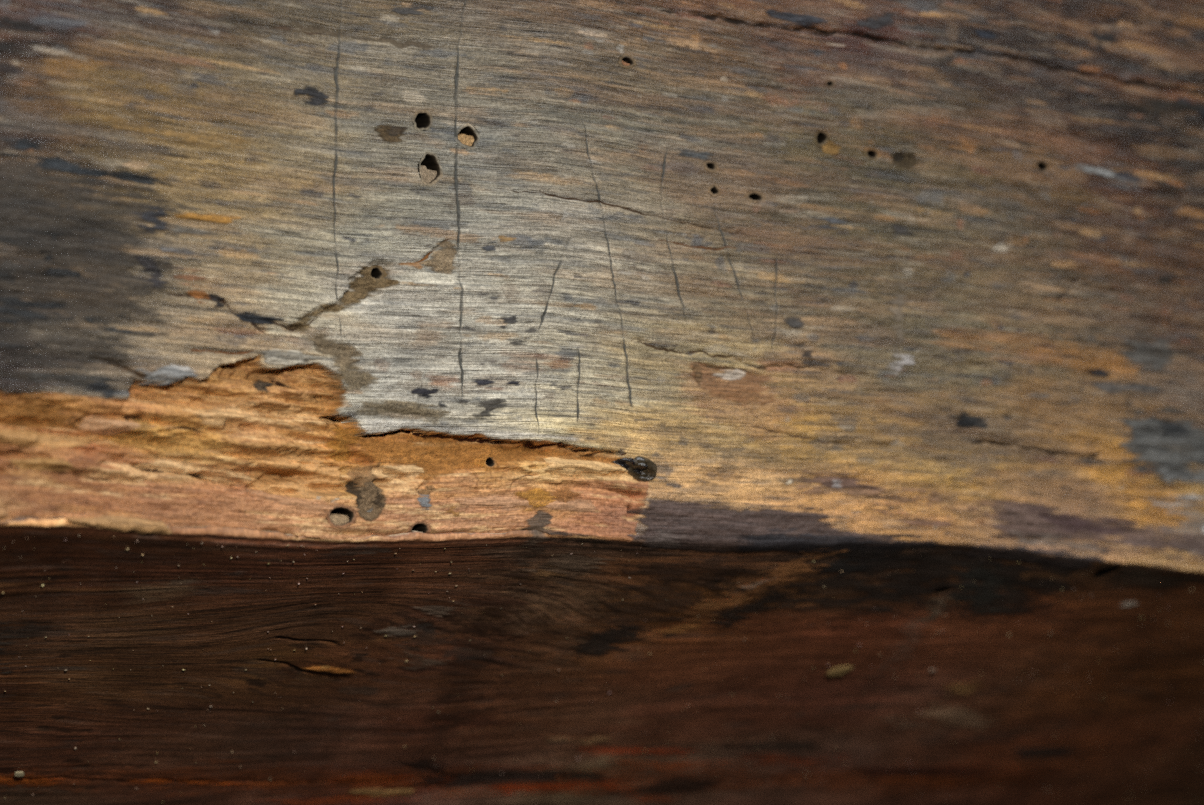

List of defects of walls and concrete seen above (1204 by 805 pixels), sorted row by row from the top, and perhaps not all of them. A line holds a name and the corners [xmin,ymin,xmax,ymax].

peeling [262,349,323,366]
peeling [136,365,197,386]